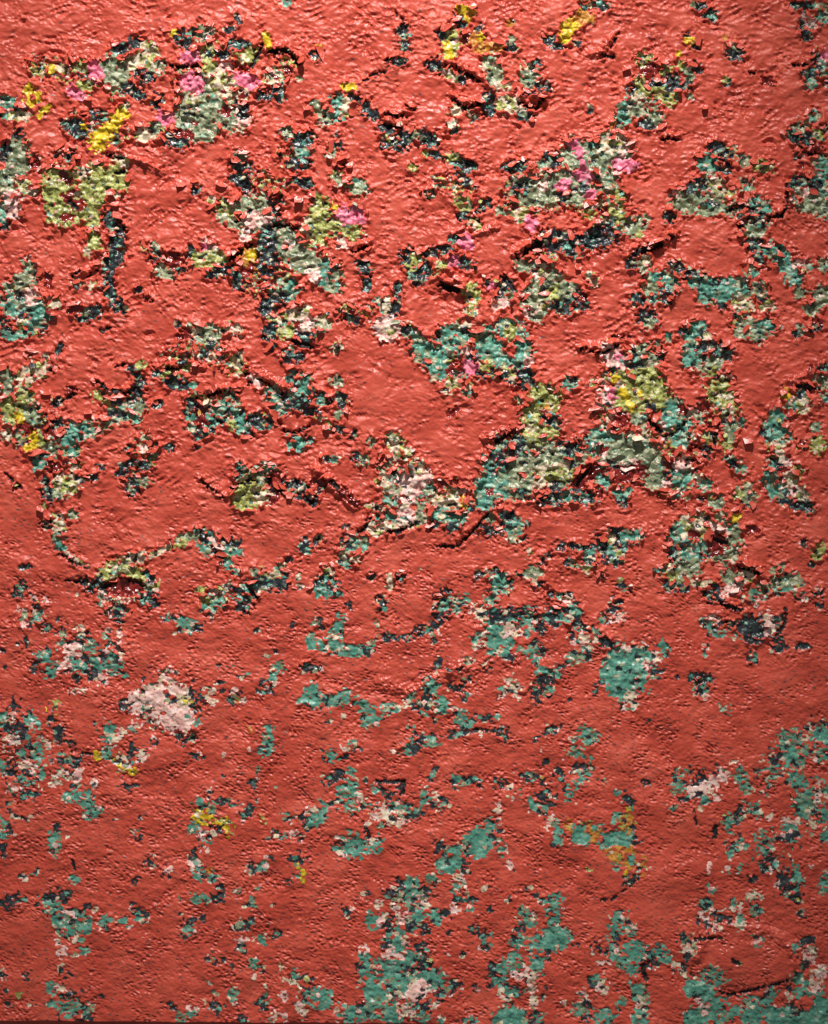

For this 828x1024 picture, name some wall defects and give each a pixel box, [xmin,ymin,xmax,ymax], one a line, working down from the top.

peeling [0,0,828,756]
peeling [0,649,287,859]
peeling [0,859,150,1022]
peeling [131,853,173,885]
peeling [166,715,828,1024]